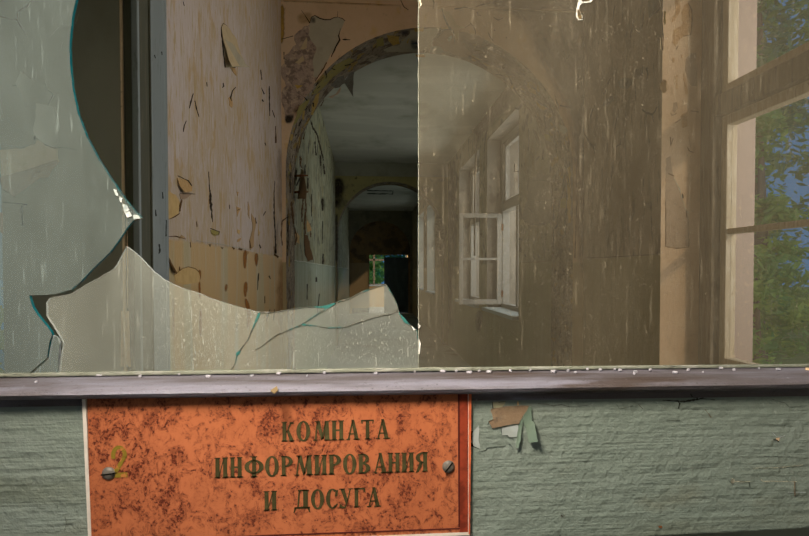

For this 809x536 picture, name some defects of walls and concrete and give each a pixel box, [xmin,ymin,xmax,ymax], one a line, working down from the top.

peeling [221,23,249,76]
flaking render [657,0,697,94]
flaking render [278,15,355,264]
water stain [487,0,591,253]
peeling [162,176,261,254]
water stain [335,178,344,262]
peeling [471,401,538,451]
crack [663,394,715,417]